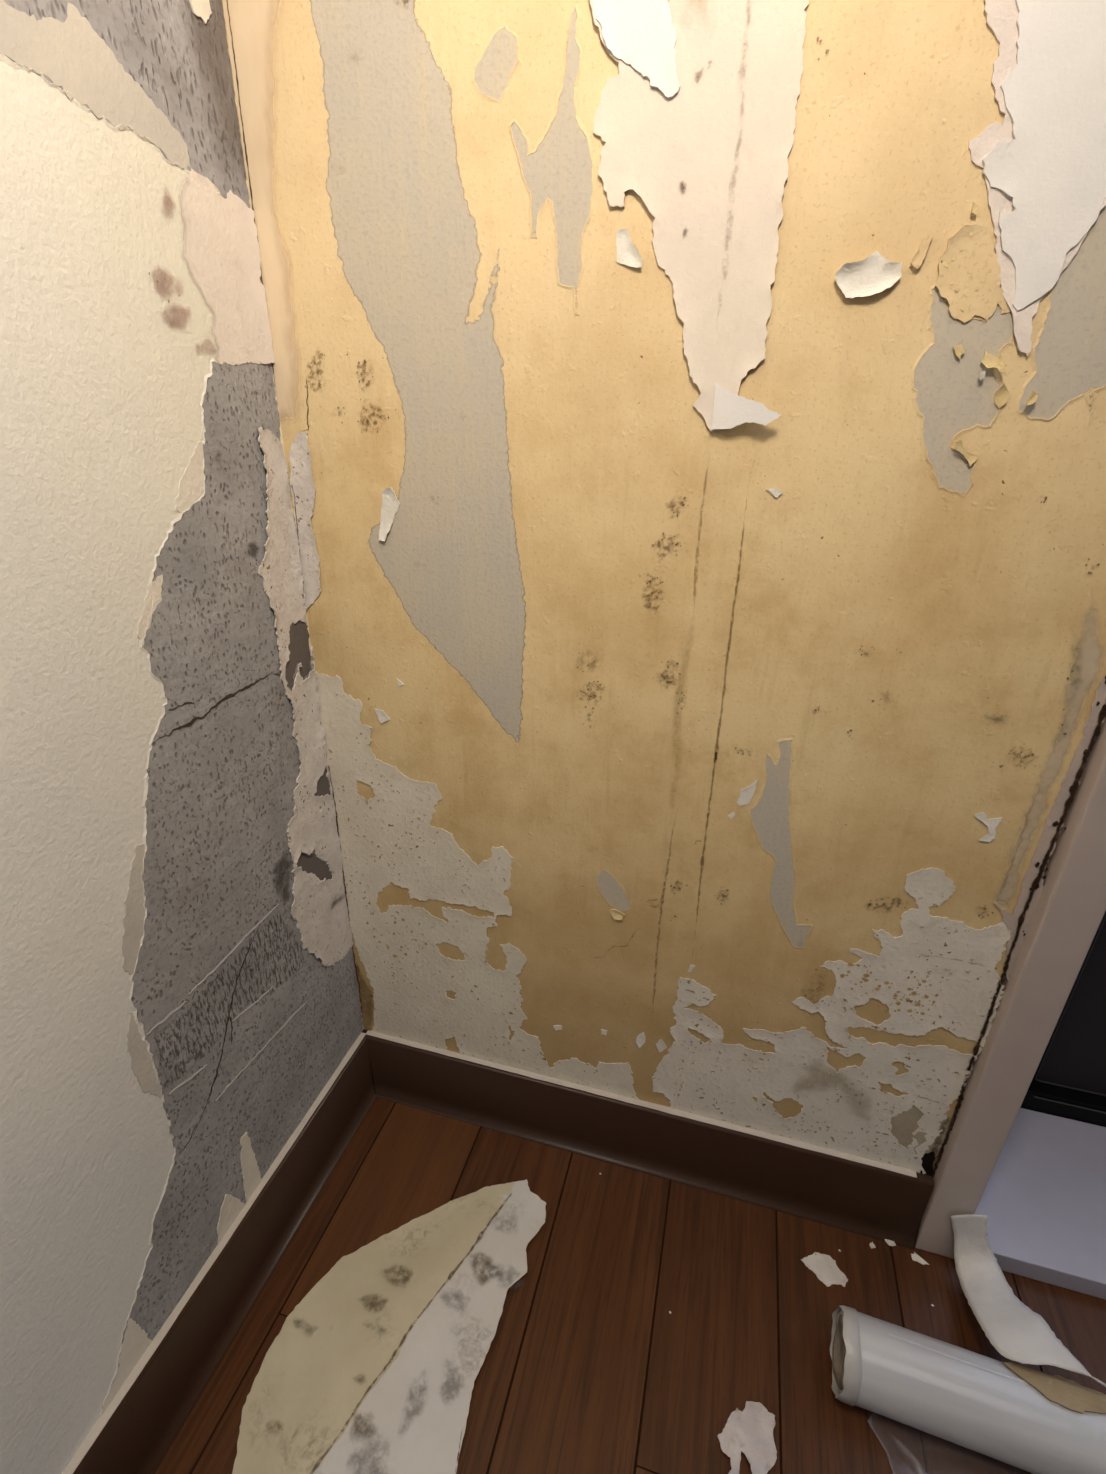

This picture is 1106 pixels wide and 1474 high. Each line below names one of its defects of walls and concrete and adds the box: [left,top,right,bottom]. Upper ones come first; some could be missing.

flaking render [0,0,250,208]
peeling [310,0,526,742]
peeling [508,2,597,316]
peeling [616,229,642,268]
peeling [911,205,1106,500]
crack [155,673,284,742]
flaking render [100,359,363,1417]
peeling [594,868,633,920]
peeling [635,1032,667,1052]
peeling [728,737,814,950]
peeling [975,812,1002,842]
water stain [926,701,1106,1178]